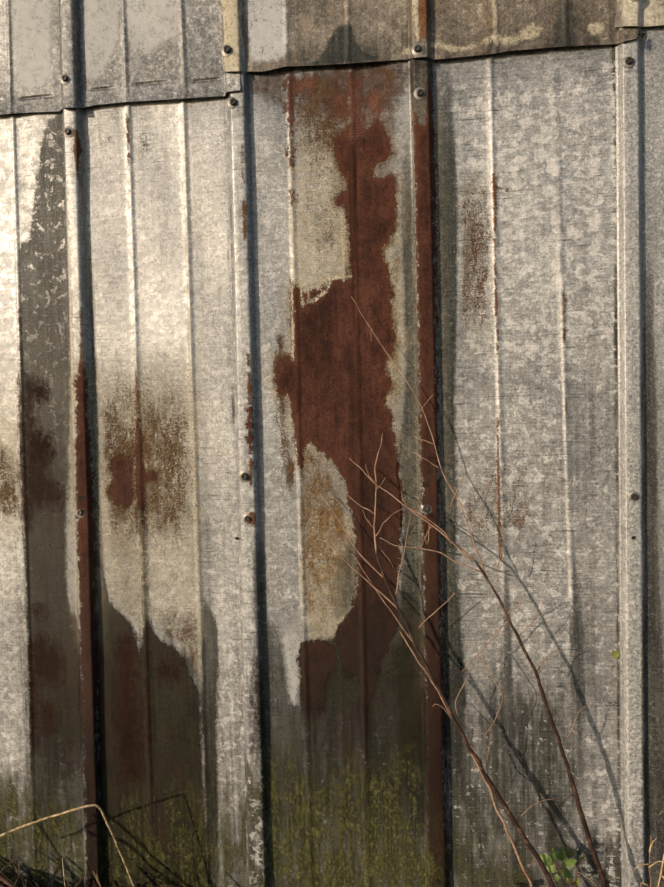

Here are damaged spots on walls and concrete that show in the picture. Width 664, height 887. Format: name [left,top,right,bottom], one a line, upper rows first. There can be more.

damp [17,113,86,795]
rust [0,311,199,887]
damp [89,298,219,887]
rust [254,63,450,887]
damp [641,297,664,883]